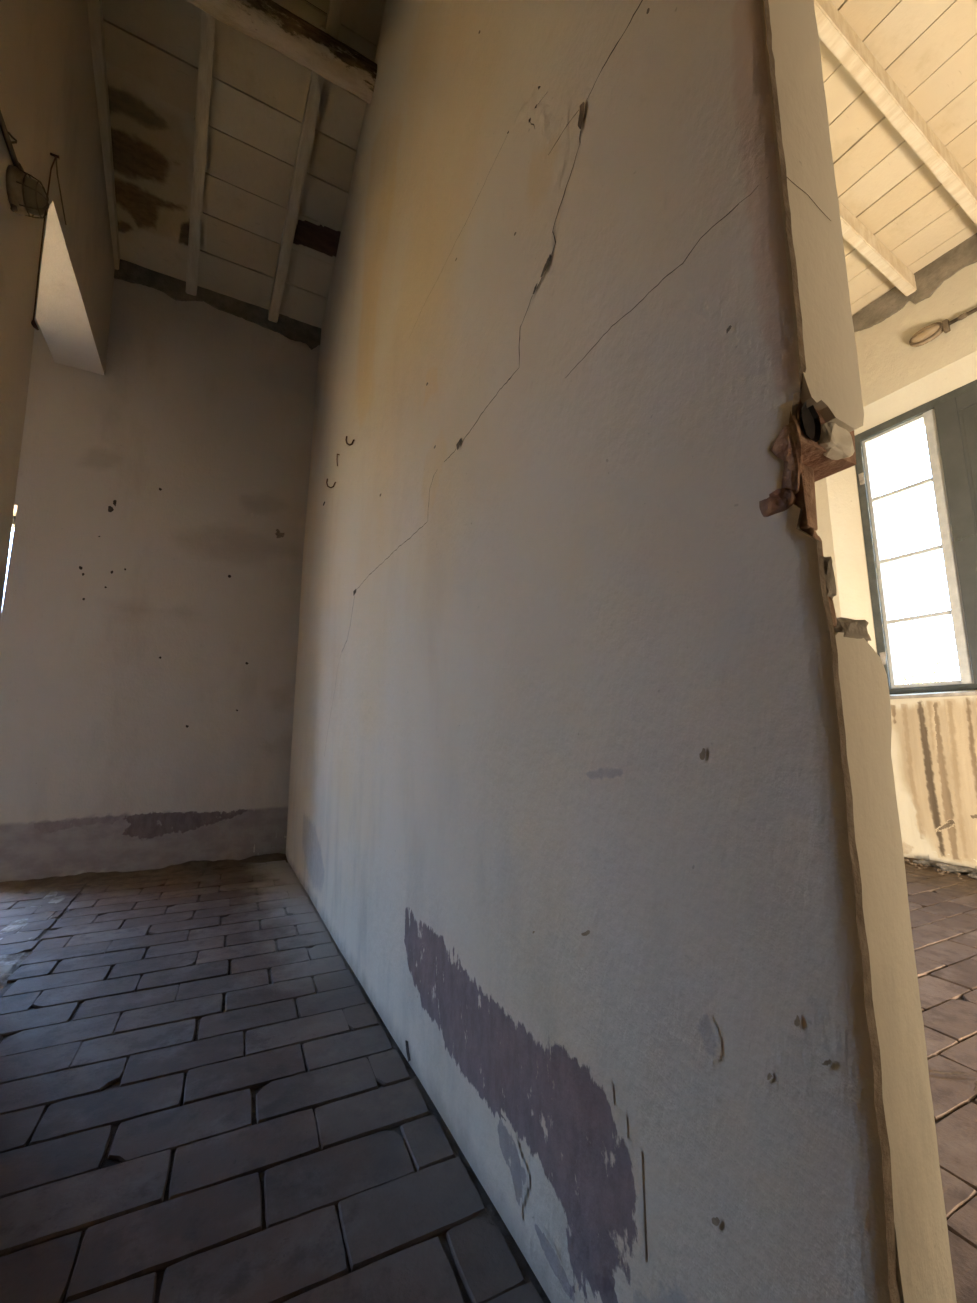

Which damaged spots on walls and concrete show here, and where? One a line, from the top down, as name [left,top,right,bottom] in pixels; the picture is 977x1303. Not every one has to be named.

leakage [106,62,194,251]
crack [567,177,831,376]
crack [324,0,643,756]
peeling [0,801,326,903]
leakage [890,696,977,869]
peeling [403,901,646,1303]